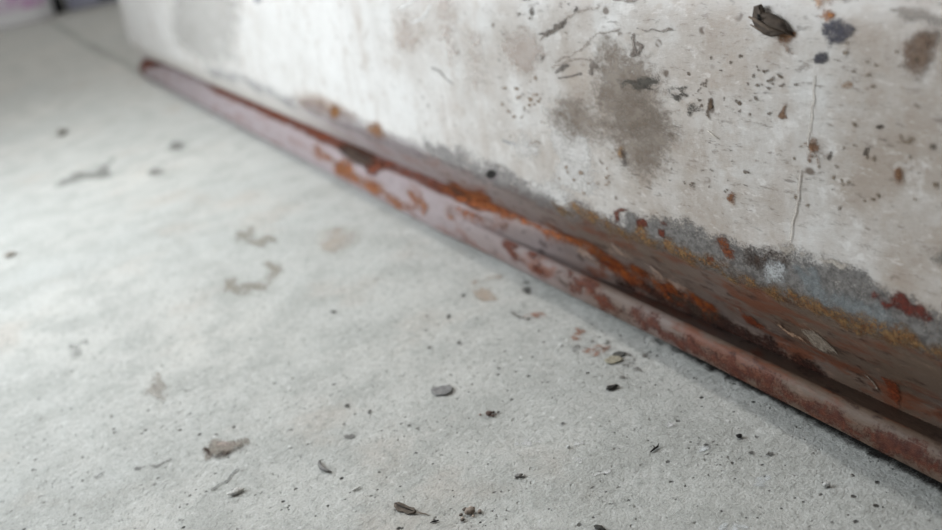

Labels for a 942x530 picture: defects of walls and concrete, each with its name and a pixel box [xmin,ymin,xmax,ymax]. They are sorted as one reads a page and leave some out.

rust [815,0,835,21]
rust [139,60,942,379]
rust [566,268,942,474]